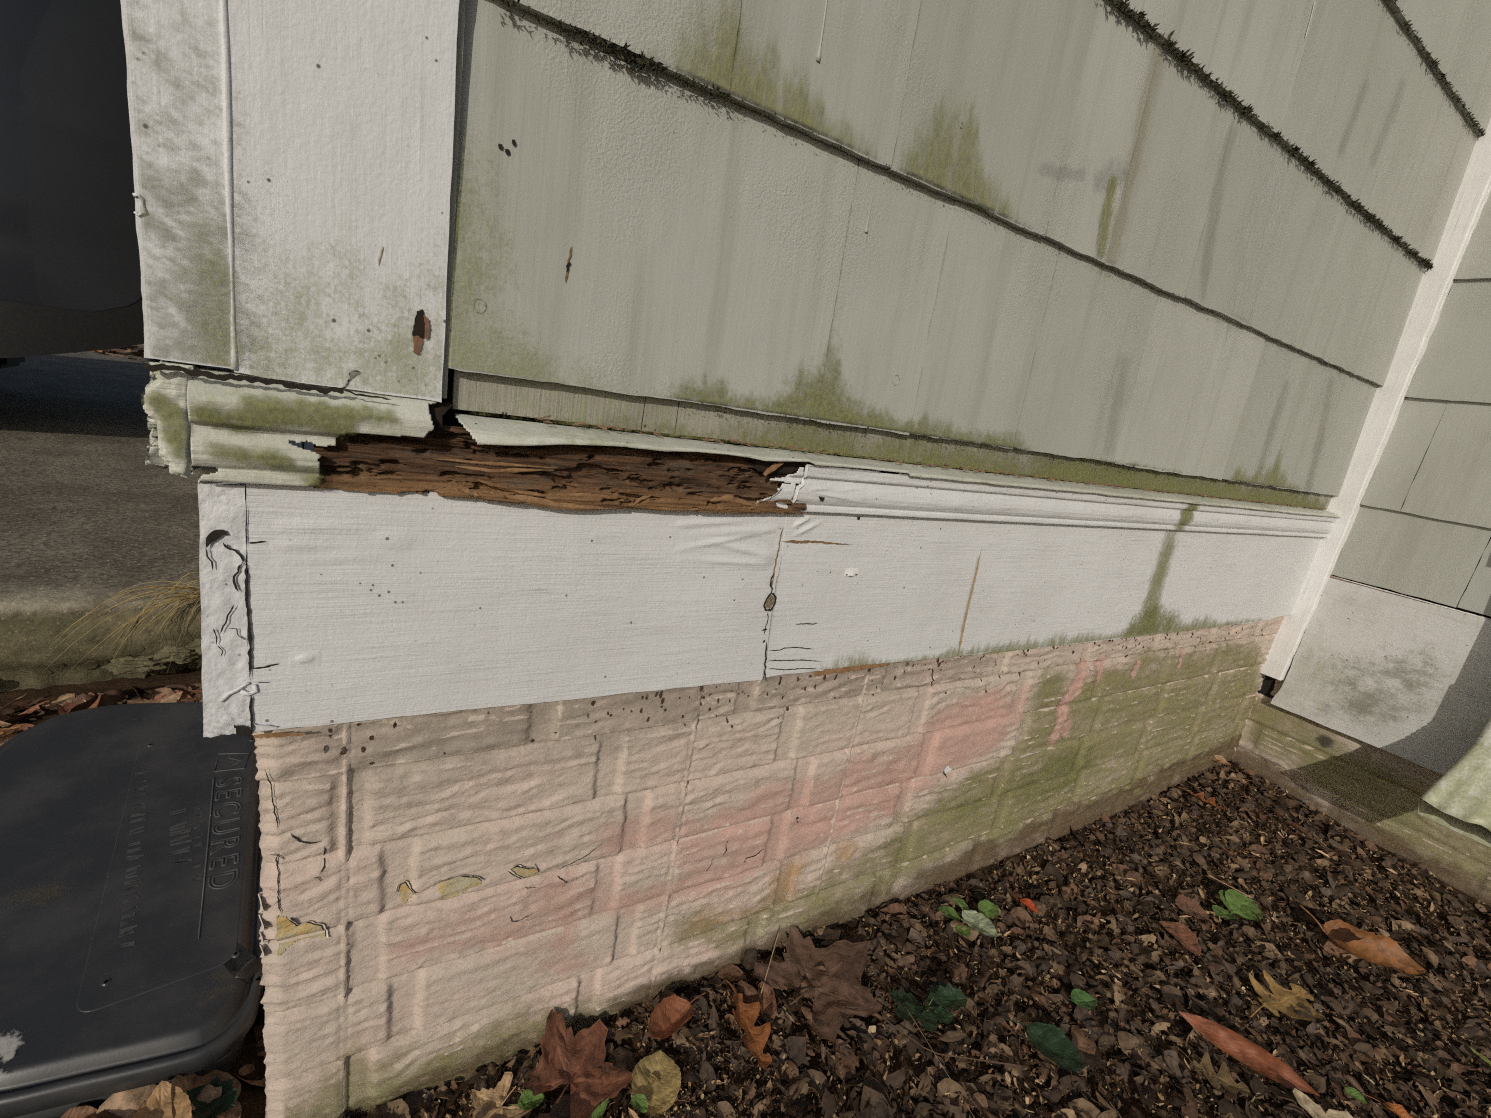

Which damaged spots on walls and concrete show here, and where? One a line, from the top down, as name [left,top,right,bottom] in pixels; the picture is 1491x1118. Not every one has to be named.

water stain [1099,176,1117,256]
spalling [754,460,809,505]
crack [205,508,277,733]
crack [762,529,849,680]
water stain [1047,655,1106,744]
crack [265,770,326,914]